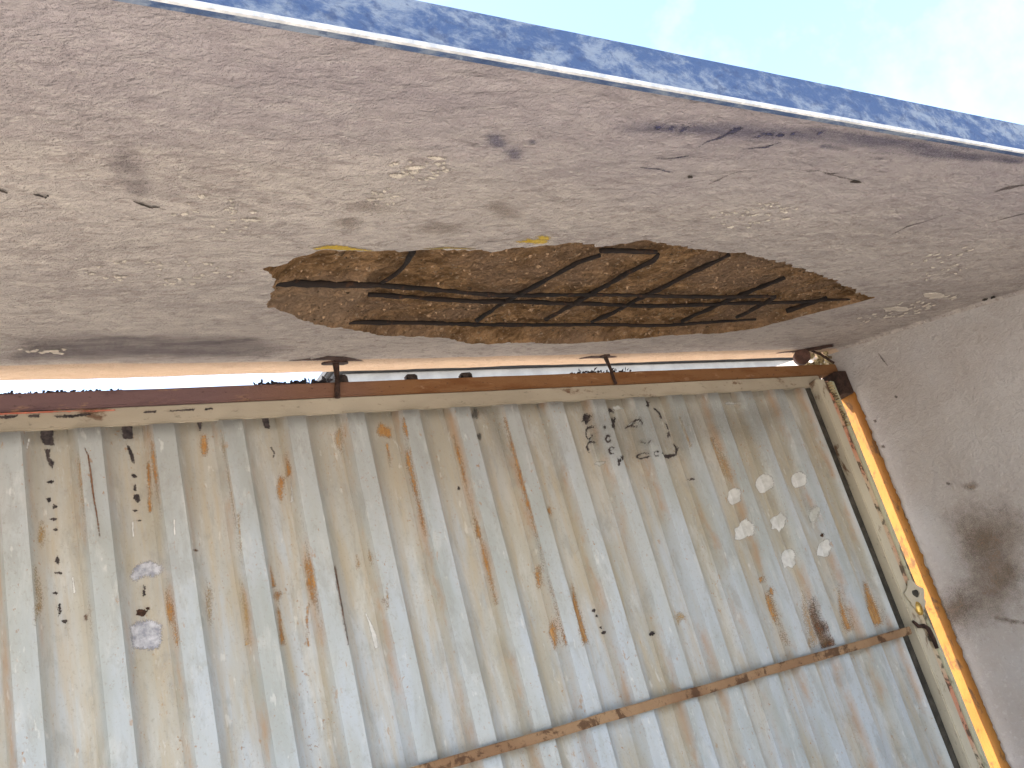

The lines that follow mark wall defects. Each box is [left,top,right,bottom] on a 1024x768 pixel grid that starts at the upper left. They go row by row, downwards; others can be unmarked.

spalling [263,240,875,344]
rust [146,444,158,513]
rust [277,459,291,500]
rust [377,417,426,535]
rust [504,421,537,535]
rust [165,589,178,646]
rust [549,594,567,648]
rust [572,586,587,643]
rust [804,599,834,649]